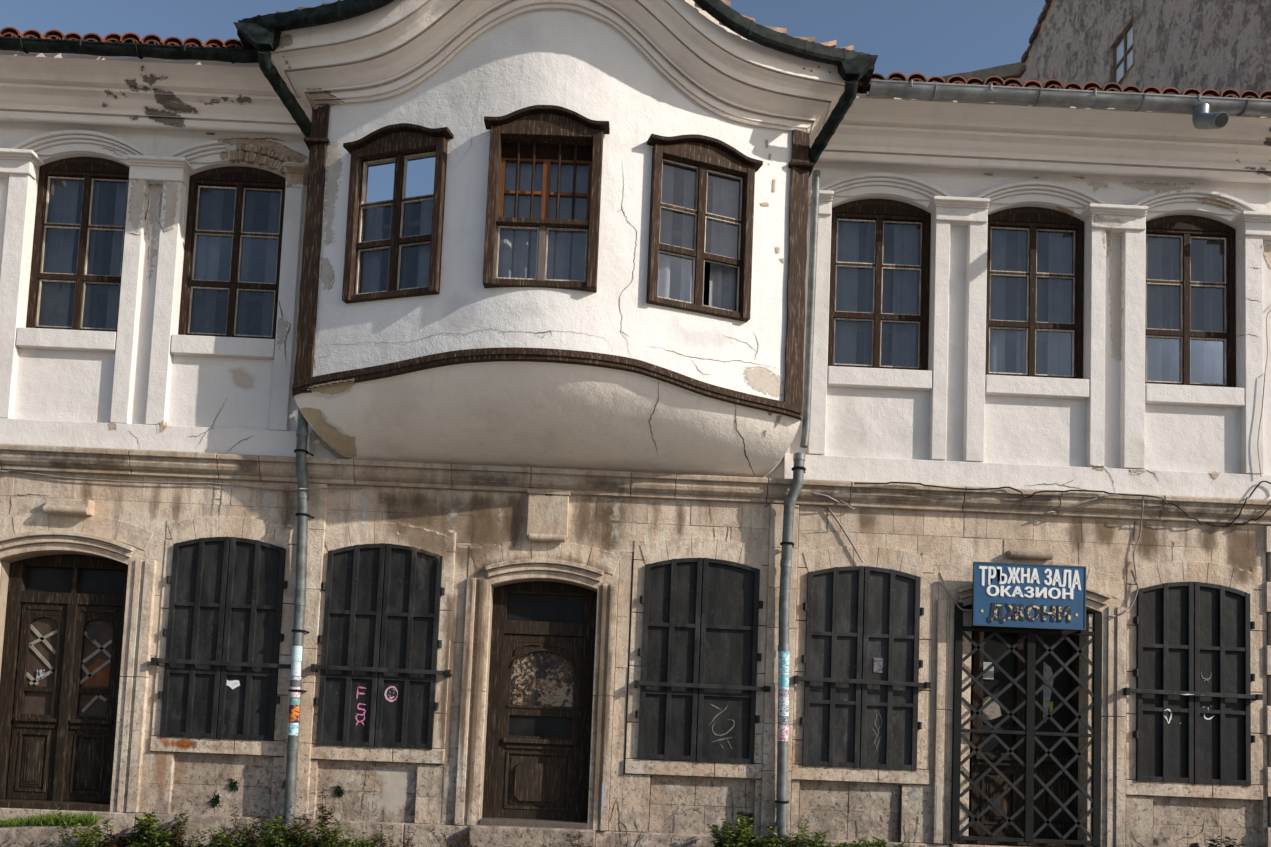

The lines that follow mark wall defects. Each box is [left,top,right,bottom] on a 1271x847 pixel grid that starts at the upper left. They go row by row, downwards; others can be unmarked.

spalling [102,66,253,127]
flaking render [127,180,180,282]
crack [278,165,776,375]
crack [187,401,253,518]
flaking render [300,378,357,459]
crack [649,380,659,454]
crack [735,403,755,475]
peeling [743,365,784,397]
water stain [1139,525,1158,556]
water stain [1200,528,1257,582]
water stain [361,491,522,809]
water stain [594,587,613,822]